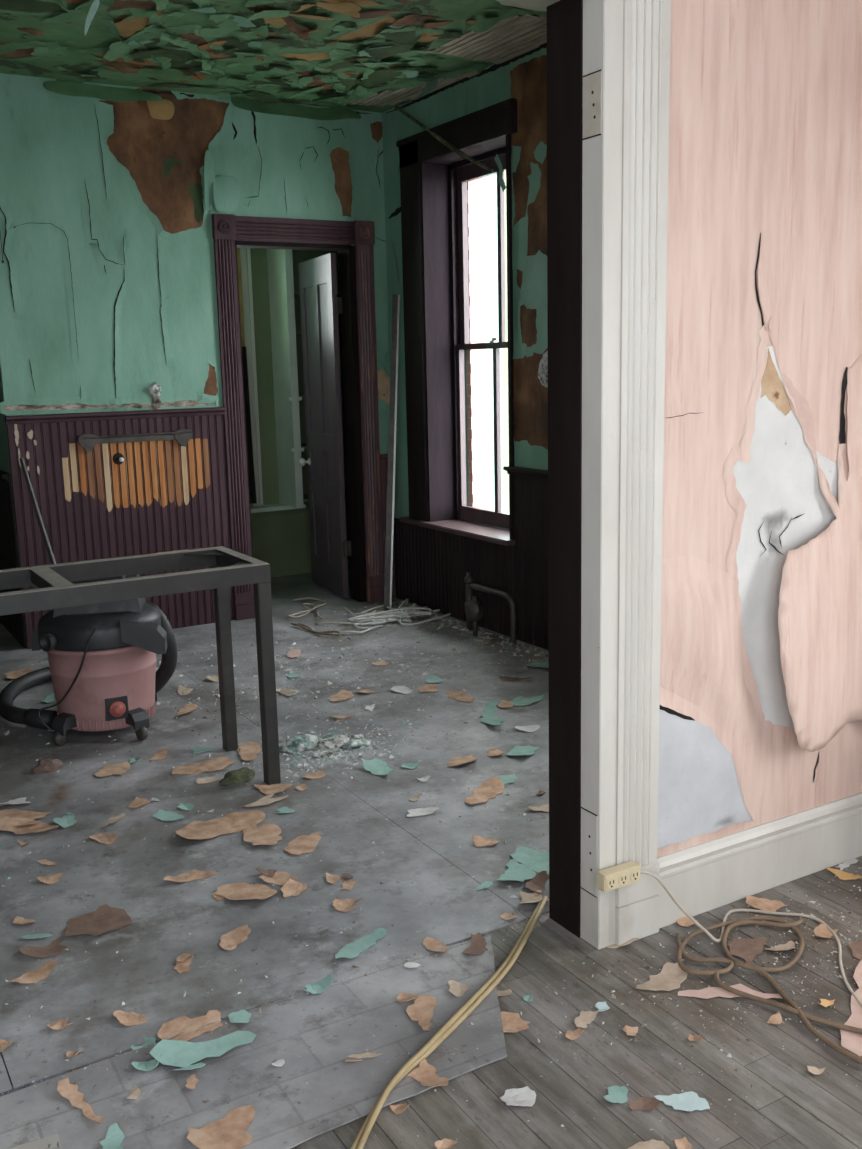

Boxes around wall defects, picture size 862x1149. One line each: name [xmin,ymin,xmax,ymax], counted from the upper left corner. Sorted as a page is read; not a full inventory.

peeling [0,0,560,240]
crack [0,179,131,400]
crack [156,233,173,366]
peeling [509,47,548,456]
crack [755,233,775,347]
spalling [0,359,222,474]
peeling [377,363,390,410]
peeling [62,438,211,512]
flaking render [657,709,760,856]
peeling [57,1078,125,1149]
peeling [187,1105,256,1149]
peeling [407,1058,448,1087]